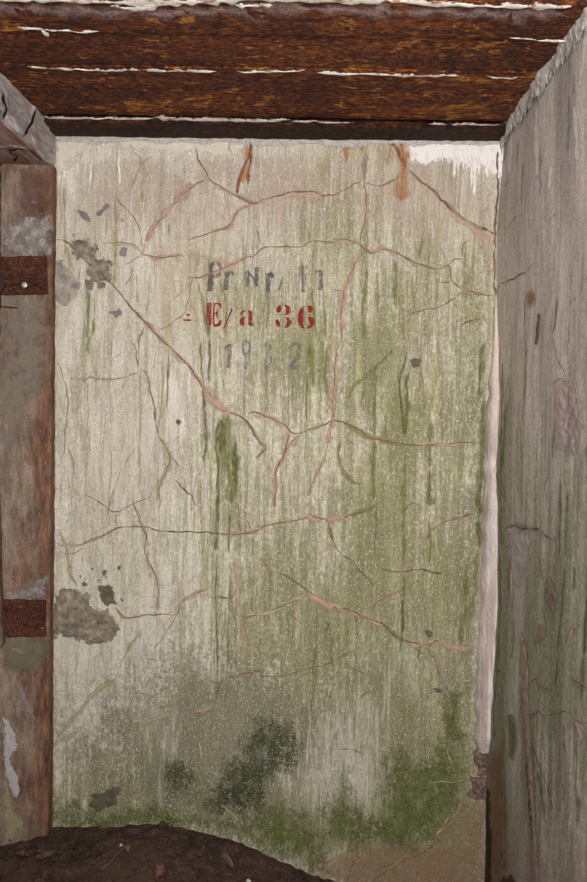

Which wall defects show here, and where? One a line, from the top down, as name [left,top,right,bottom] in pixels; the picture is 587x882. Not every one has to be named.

damp [18,27,99,37]
damp [0,0,571,23]
rust [236,143,252,193]
rust [389,143,409,199]
damp [404,128,519,195]
flaking render [55,233,127,306]
crack [547,276,587,387]
crack [53,143,532,788]
crack [496,473,555,541]
flaking render [53,566,123,645]
flaking render [89,787,122,813]
damp [204,718,300,815]